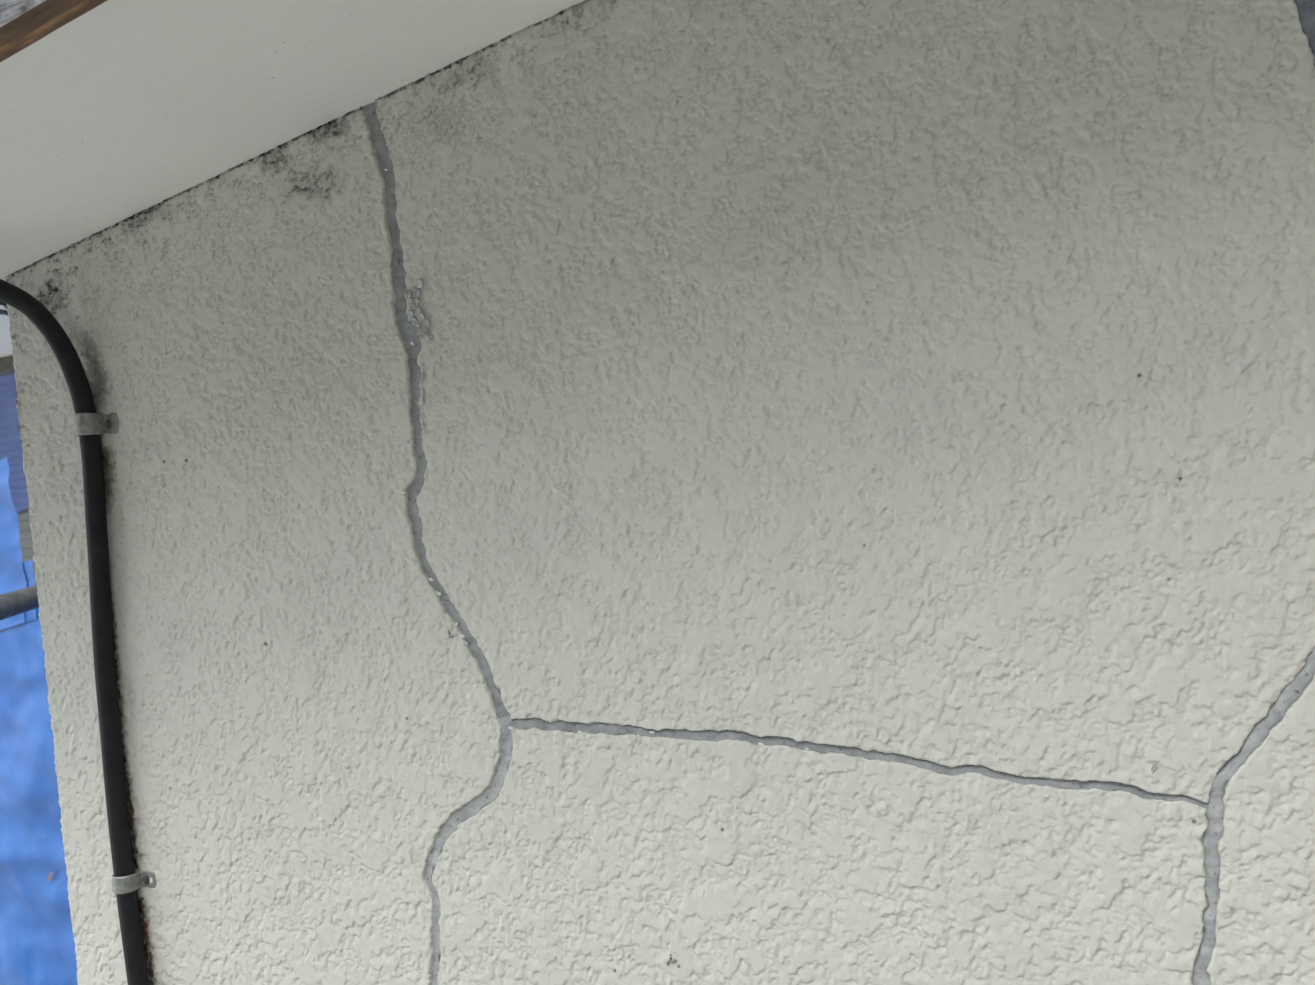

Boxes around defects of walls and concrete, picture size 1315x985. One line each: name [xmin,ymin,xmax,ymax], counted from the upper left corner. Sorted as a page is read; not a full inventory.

crack [1294,0,1315,66]
crack [363,102,1315,985]